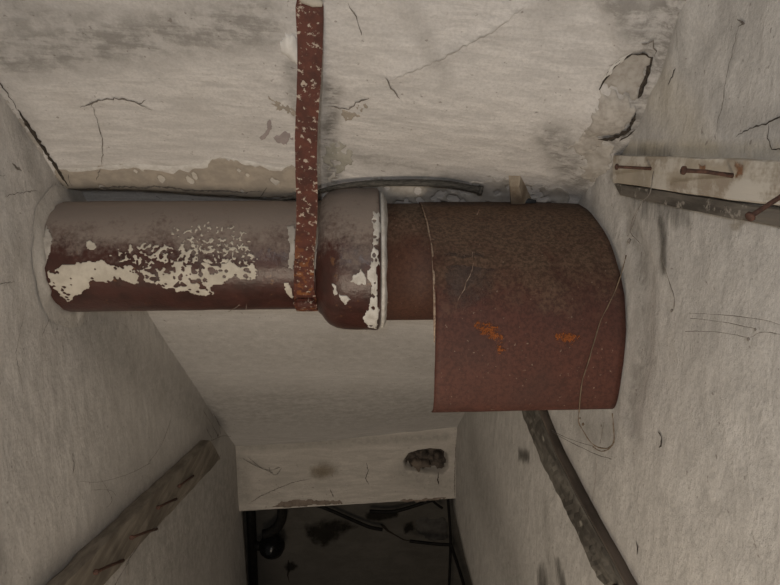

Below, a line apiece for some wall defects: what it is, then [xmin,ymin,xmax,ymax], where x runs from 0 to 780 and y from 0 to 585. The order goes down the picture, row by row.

crack [0,83,267,198]
peeling [54,156,296,198]
spalling [567,40,657,182]
crack [715,19,745,135]
crack [736,116,780,150]
spalling [404,448,446,485]